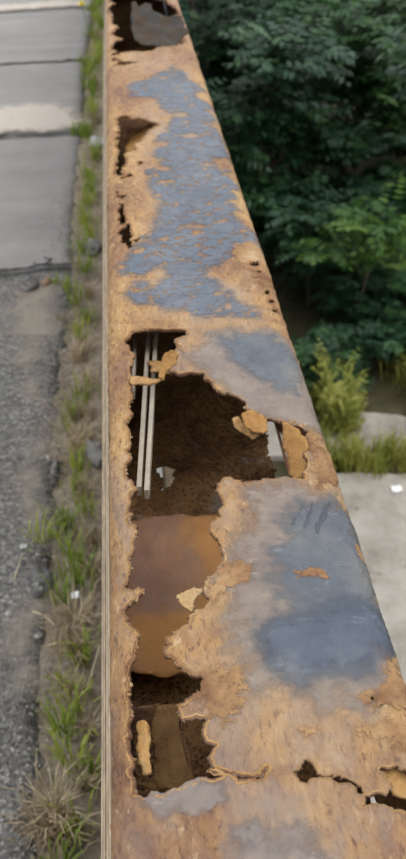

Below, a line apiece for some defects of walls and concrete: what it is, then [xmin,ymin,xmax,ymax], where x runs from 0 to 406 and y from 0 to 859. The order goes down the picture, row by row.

peeling [118,64,262,317]
rust [232,241,283,316]
peeling [219,333,302,395]
spalling [274,423,290,477]
rust [176,327,406,751]
rust [141,777,226,818]
crack [292,758,365,795]
rust [380,768,406,800]